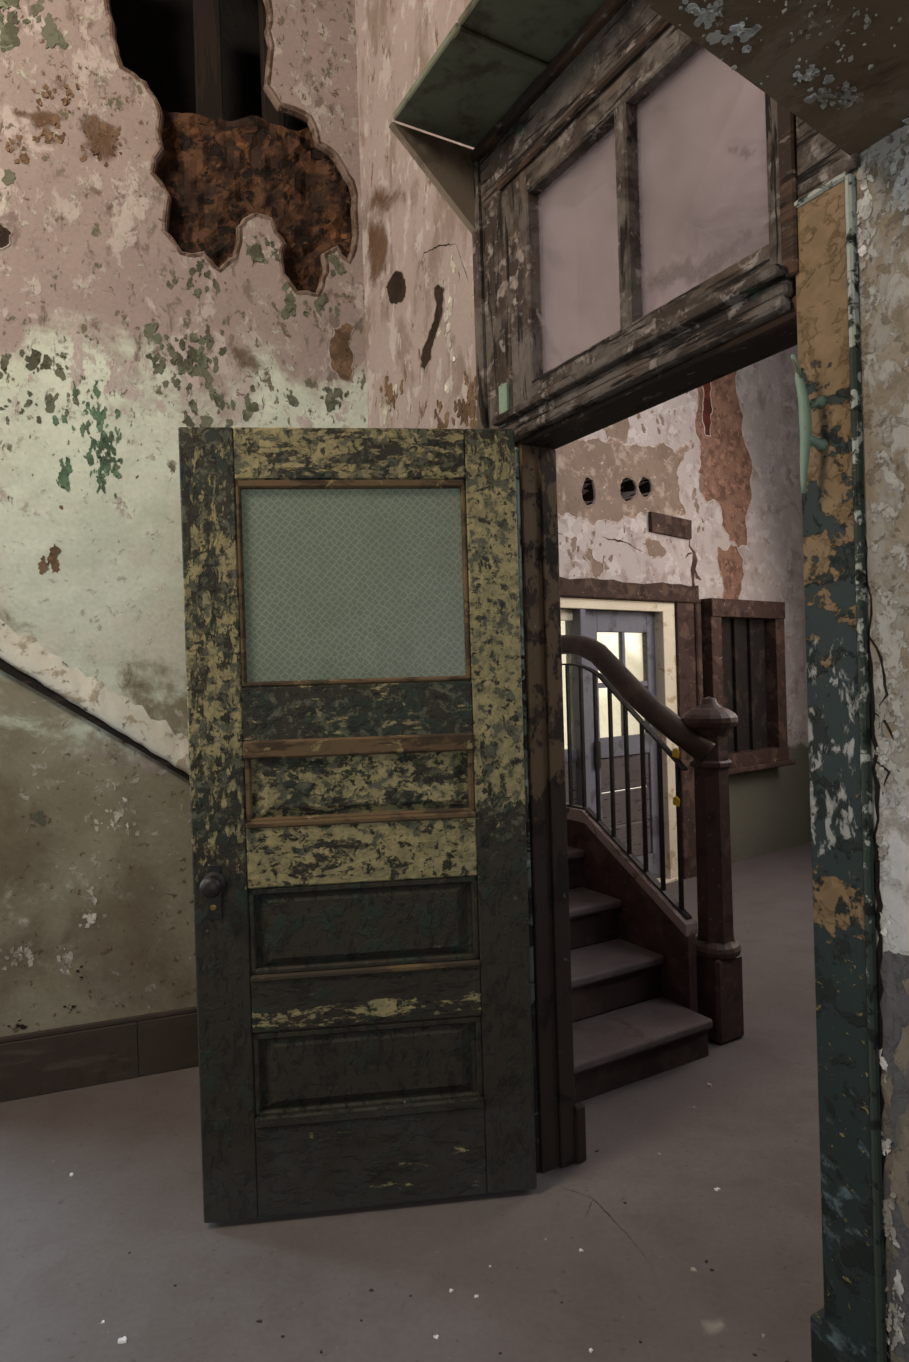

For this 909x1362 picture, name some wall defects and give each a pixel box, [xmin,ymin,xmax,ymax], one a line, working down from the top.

peeling [0,0,69,52]
peeling [679,0,762,71]
peeling [759,0,878,110]
peeling [0,74,122,201]
spalling [0,222,13,250]
spalling [104,0,359,427]
peeling [851,118,909,287]
peeling [0,348,123,499]
peeling [555,371,754,599]
peeling [38,544,60,575]
peeling [879,1024,909,1248]
peeling [885,1269,905,1357]